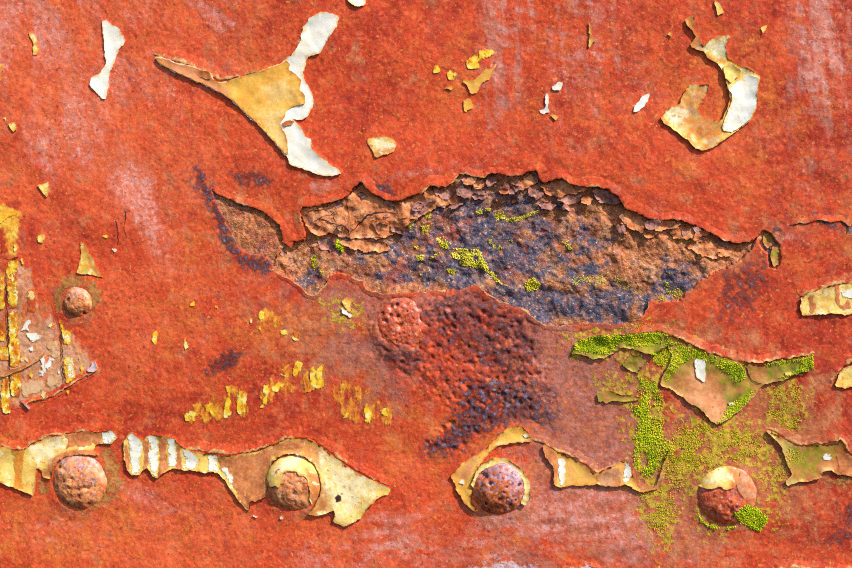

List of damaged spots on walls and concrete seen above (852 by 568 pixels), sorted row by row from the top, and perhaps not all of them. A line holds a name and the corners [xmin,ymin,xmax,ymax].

peeling [90,20,125,99]
peeling [150,5,341,176]
peeling [433,49,496,112]
peeling [661,16,760,150]
crack [789,214,852,233]
peeling [0,242,102,414]
rust [195,160,781,458]
peeling [795,272,852,315]
peeling [825,352,852,389]
peeling [0,422,393,526]
peeling [451,425,673,511]
peeling [765,422,852,486]